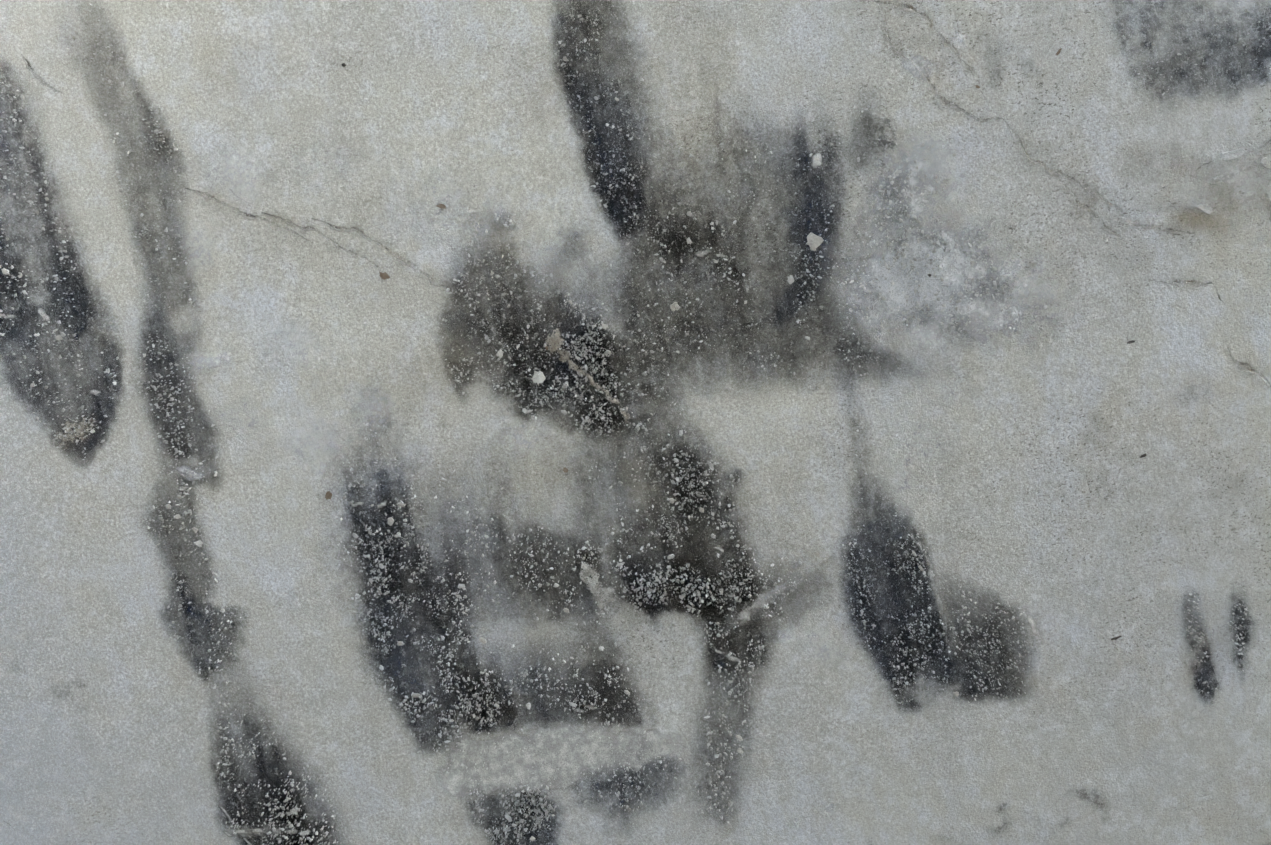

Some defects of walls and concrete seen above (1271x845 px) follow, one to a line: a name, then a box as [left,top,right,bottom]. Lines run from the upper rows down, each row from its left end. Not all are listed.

crack [873,0,948,44]
water stain [1111,1,1271,107]
water stain [0,69,119,464]
water stain [59,3,342,845]
water stain [337,0,1033,830]
water stain [1183,590,1252,698]
water stain [468,784,559,845]